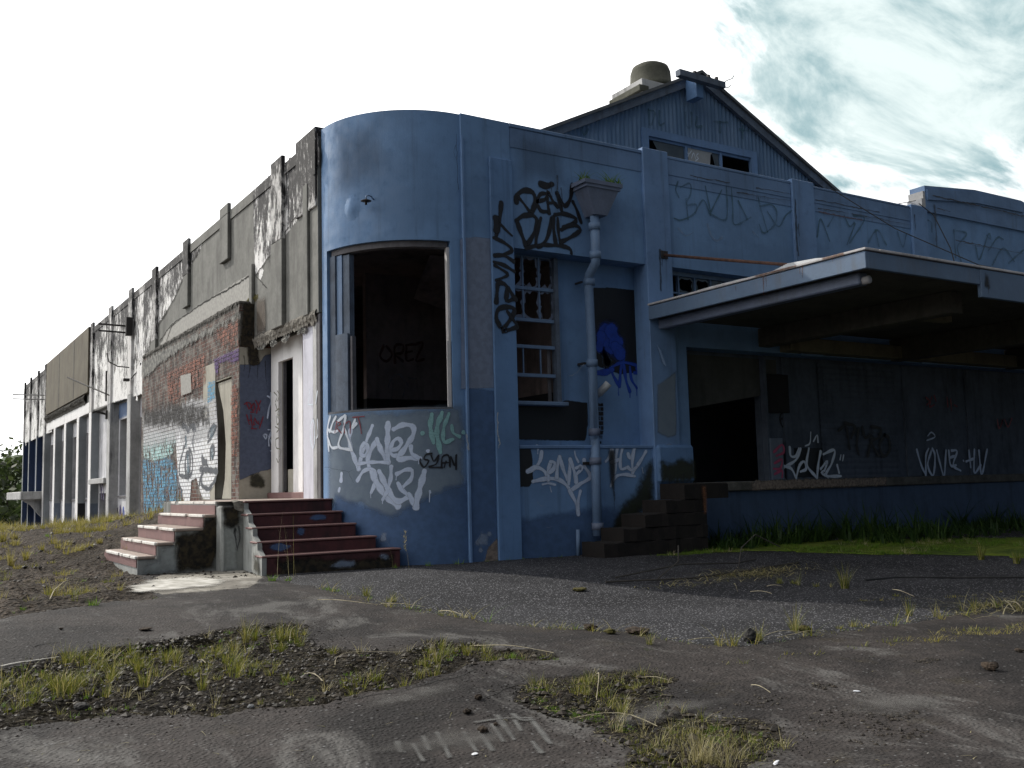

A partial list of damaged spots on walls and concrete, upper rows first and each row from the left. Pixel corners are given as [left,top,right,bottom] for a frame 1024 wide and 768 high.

peeling [25,175,271,444]
spalling [252,309,317,351]